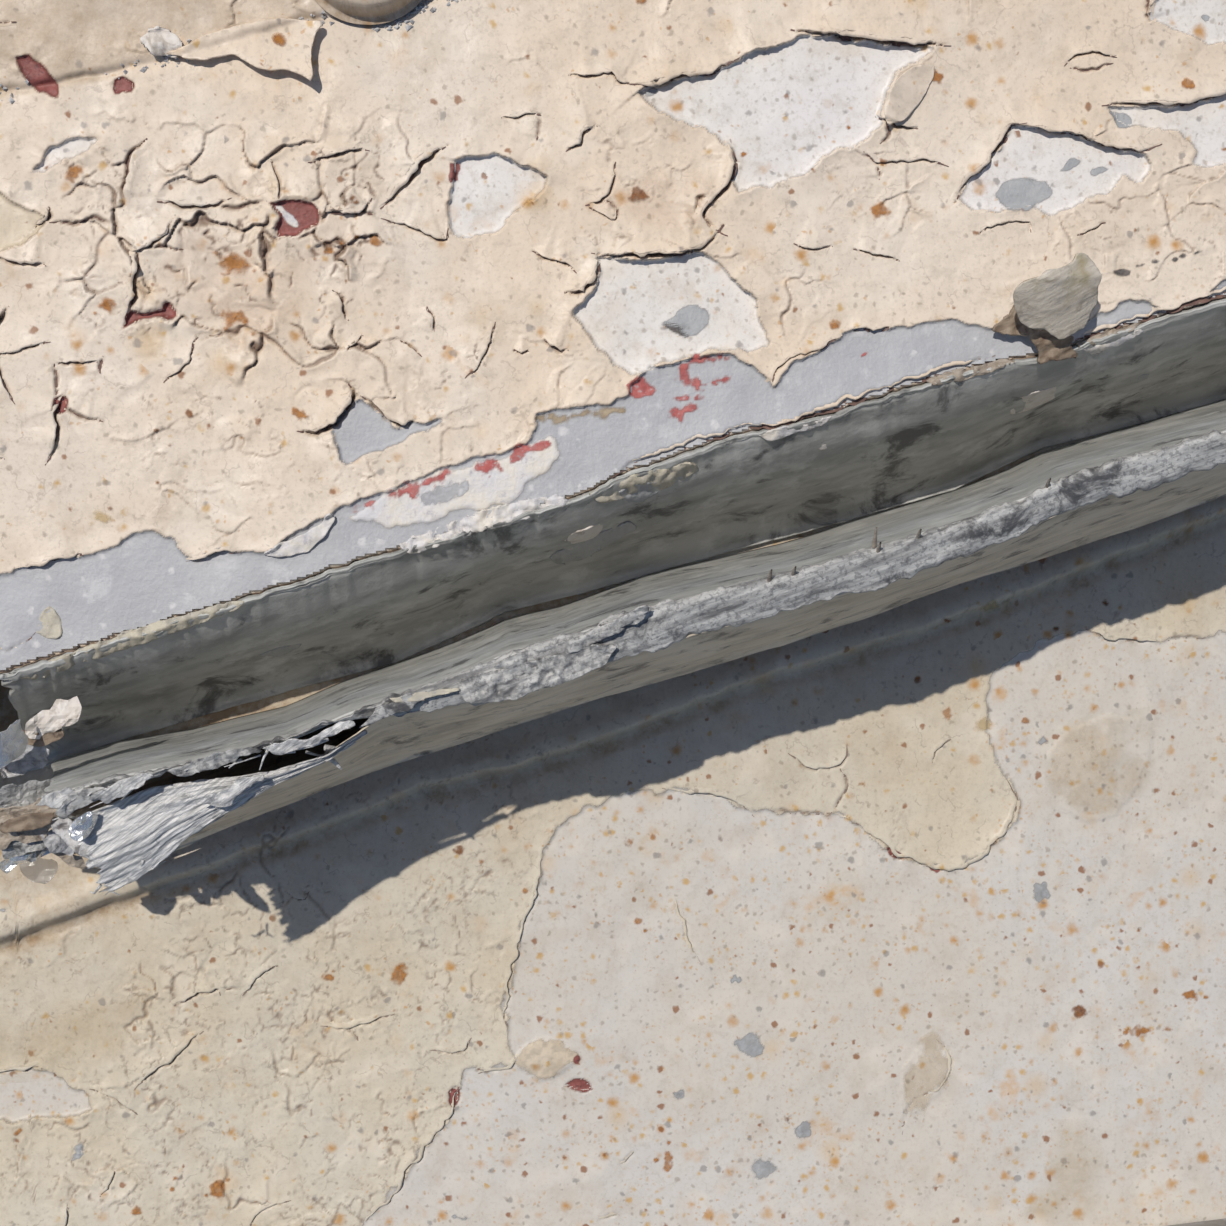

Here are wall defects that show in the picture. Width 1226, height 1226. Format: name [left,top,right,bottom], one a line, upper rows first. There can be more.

crack [0,138,280,319]
peeling [140,18,321,81]
crack [323,139,449,240]
peeling [448,153,547,238]
crack [532,140,738,294]
peeling [638,33,935,192]
peeling [960,124,1151,216]
crack [0,336,103,465]
crack [297,381,417,434]
peeling [0,251,1038,670]
crack [186,544,243,562]
peeling [363,630,1226,1226]